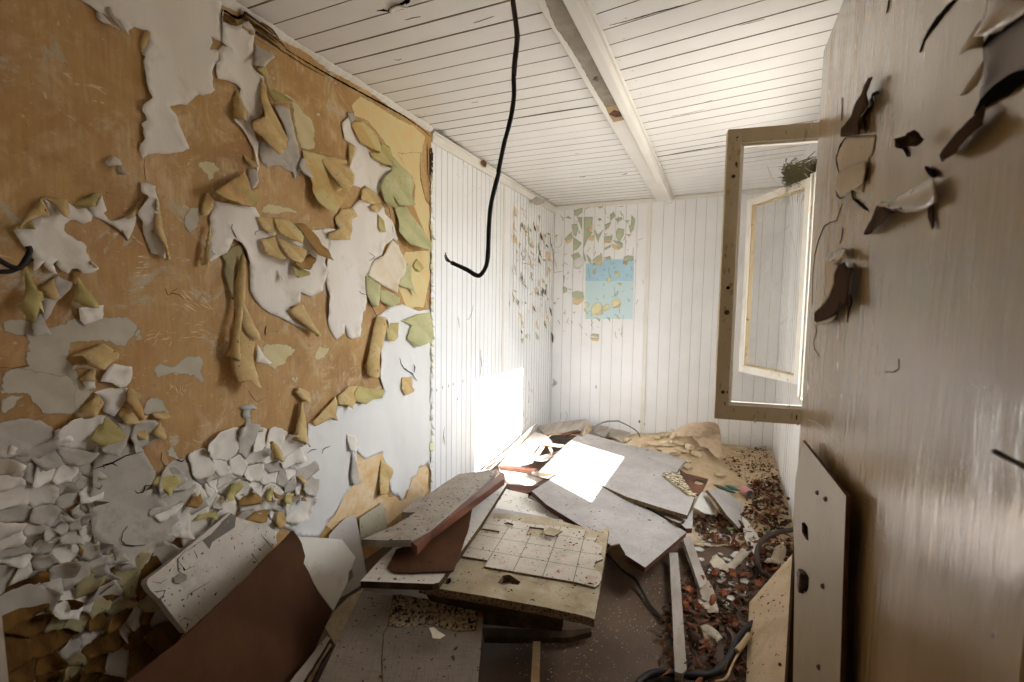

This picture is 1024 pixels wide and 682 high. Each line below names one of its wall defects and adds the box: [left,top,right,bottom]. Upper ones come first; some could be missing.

peeling [835,0,1024,235]
peeling [509,206,635,343]
peeling [814,248,854,325]
peeling [0,404,320,682]